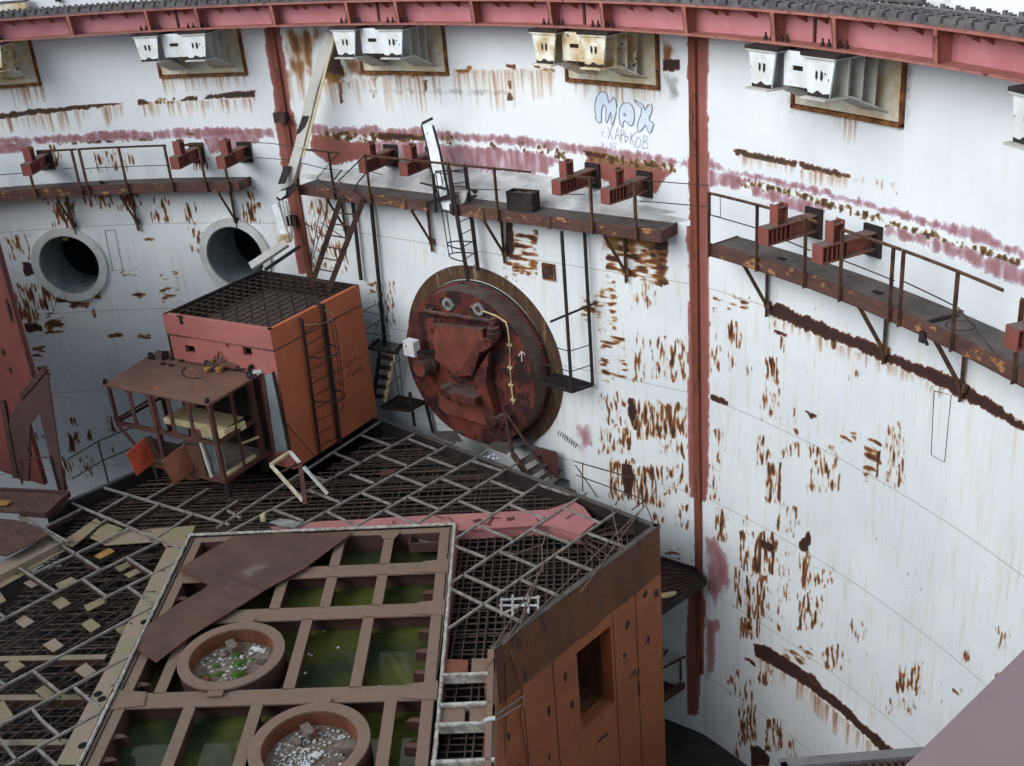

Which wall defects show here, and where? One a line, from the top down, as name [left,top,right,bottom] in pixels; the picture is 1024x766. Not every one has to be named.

rust [137,90,256,111]
rust [287,29,319,86]
rust [493,64,555,95]
rust [733,149,850,180]
rust [242,187,261,223]
rust [737,176,1020,267]
rust [505,222,538,281]
rust [4,233,101,379]
rust [593,236,689,530]
rust [761,302,1024,431]
rust [709,422,904,766]
rust [886,665,920,716]